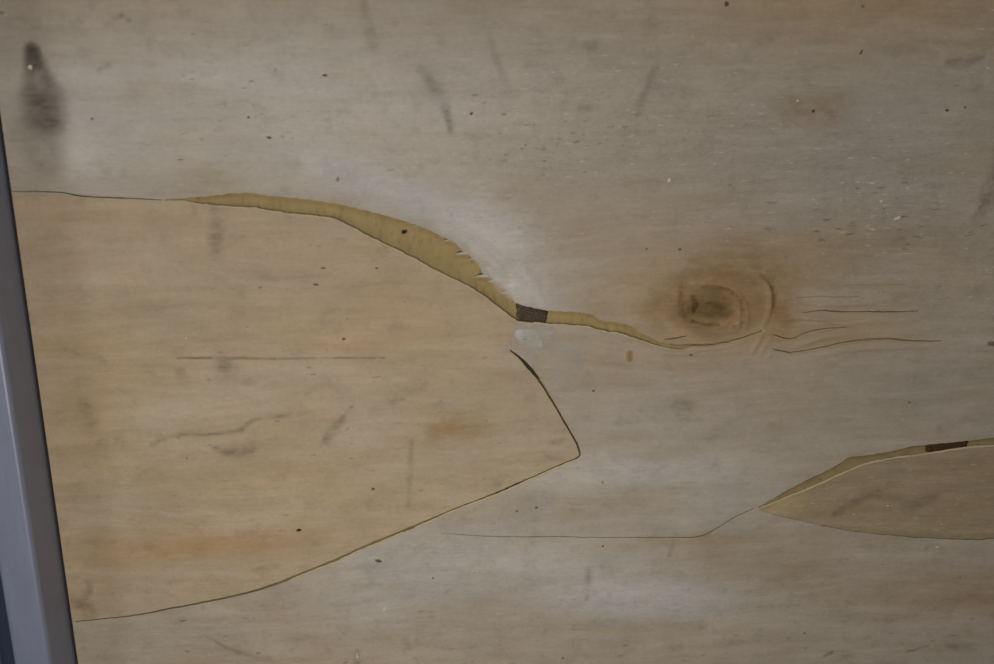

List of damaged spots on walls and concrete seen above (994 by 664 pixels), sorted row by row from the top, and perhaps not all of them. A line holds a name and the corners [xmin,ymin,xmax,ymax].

crack [12,191,762,351]
crack [75,350,754,622]
peeling [759,437,994,540]